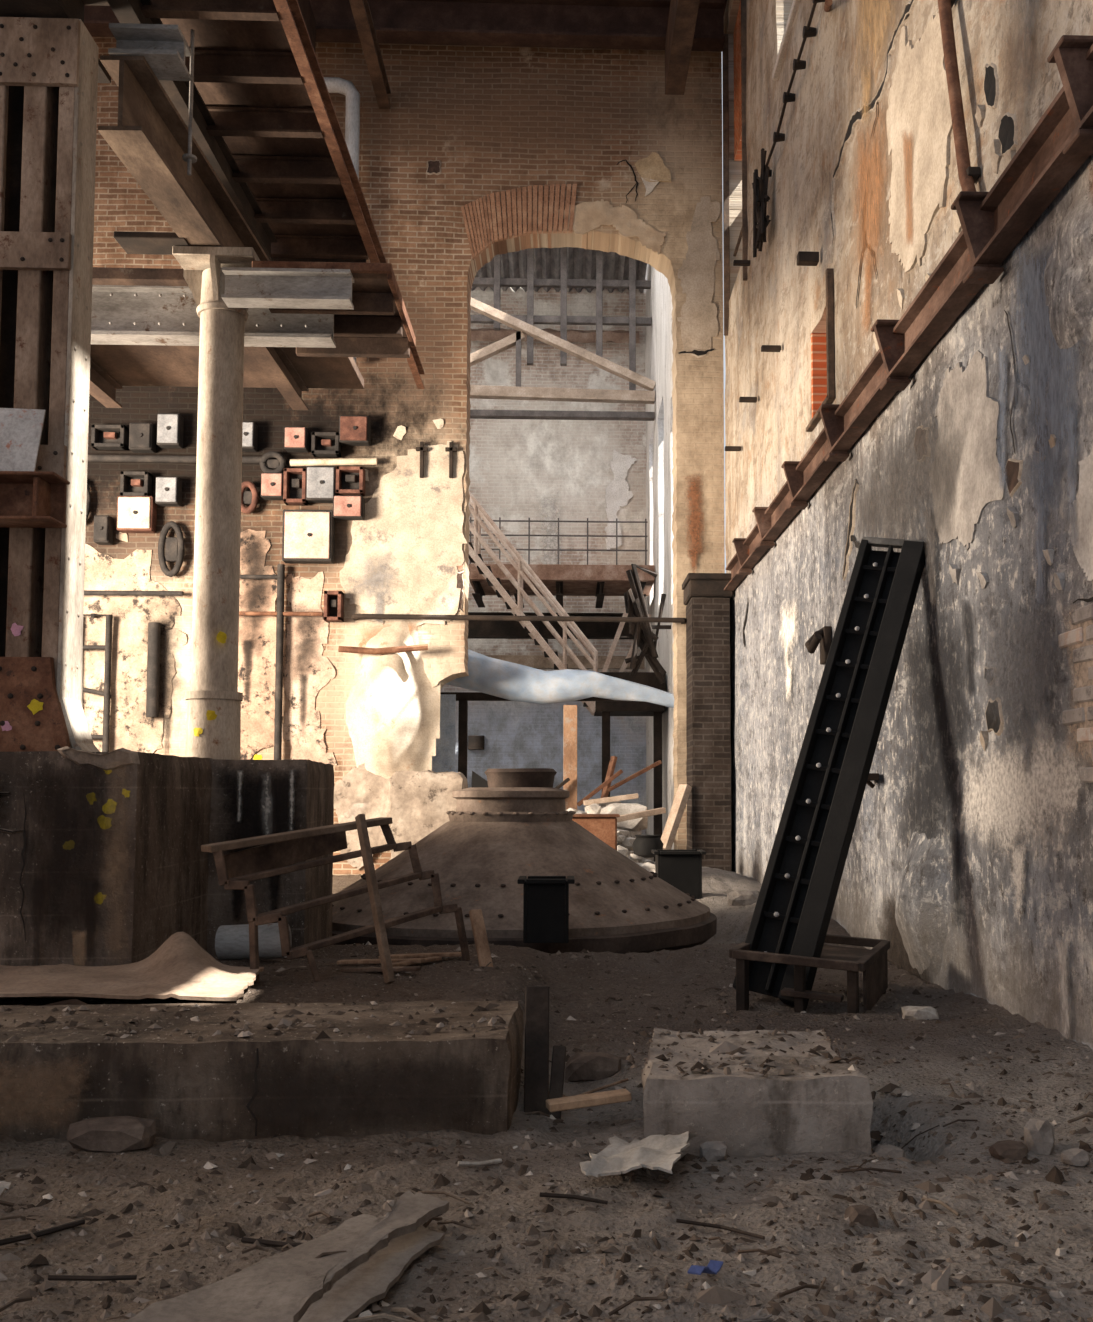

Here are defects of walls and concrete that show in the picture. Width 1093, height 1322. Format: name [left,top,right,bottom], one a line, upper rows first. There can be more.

corrosion [858,142,881,328]
crack [830,0,917,308]
corrosion [904,138,912,239]
peeling [1069,447,1093,587]
water stain [962,603,972,692]
flaking render [1058,603,1093,783]